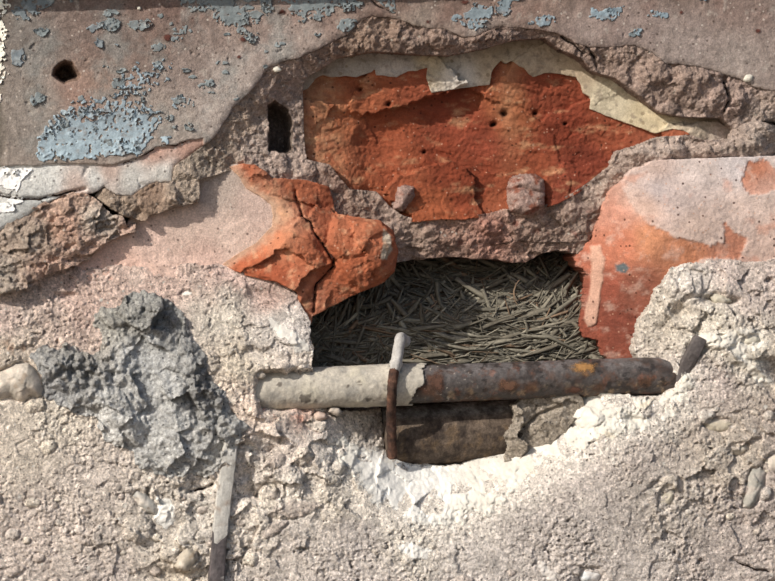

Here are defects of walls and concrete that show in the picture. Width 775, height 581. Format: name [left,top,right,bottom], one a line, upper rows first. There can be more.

crack [562,37,595,59]
spalling [0,0,775,294]
crack [295,196,334,308]
corrosion [574,363,594,372]
spalling [379,399,517,408]